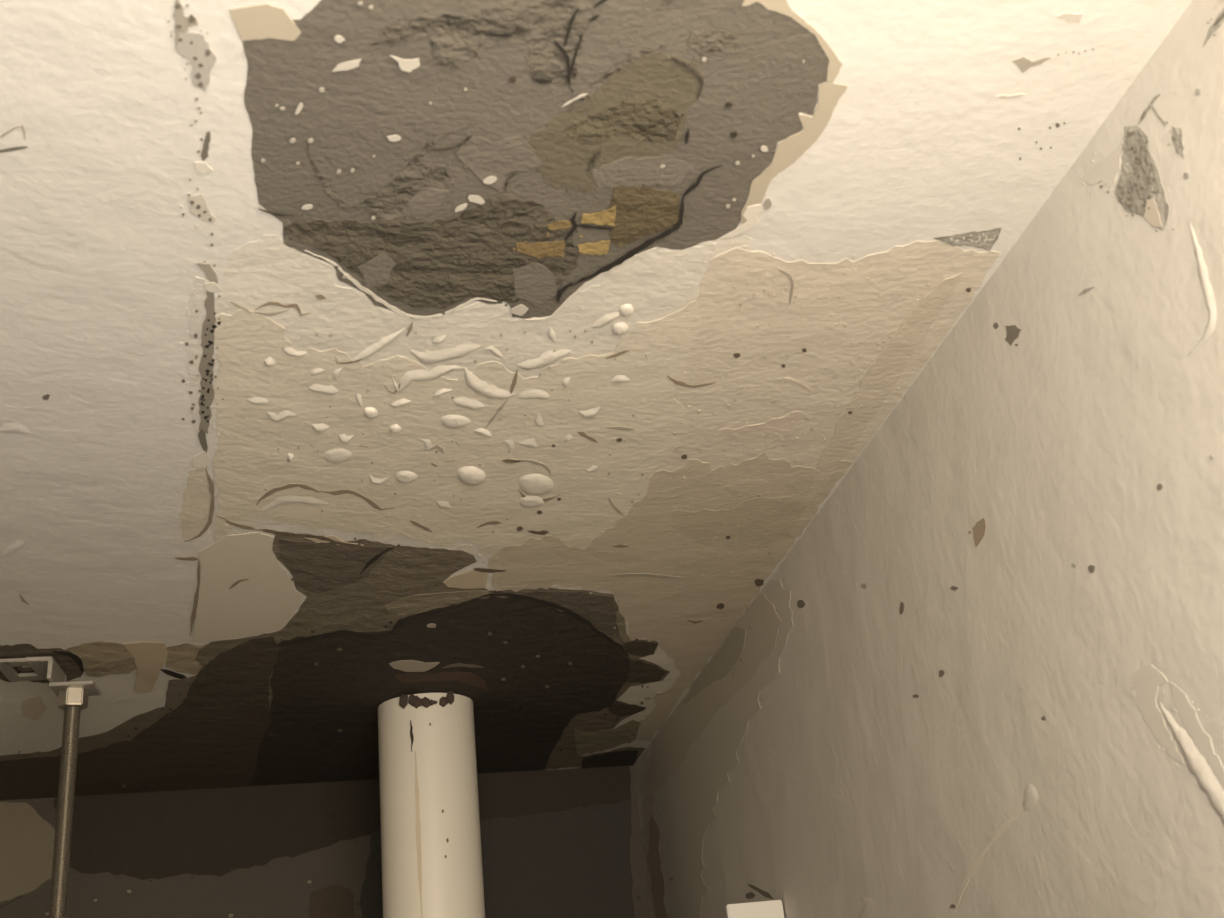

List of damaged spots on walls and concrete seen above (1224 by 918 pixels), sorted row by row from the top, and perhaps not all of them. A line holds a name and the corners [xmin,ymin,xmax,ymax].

flaking render [229,0,848,321]
crack [486,0,607,93]
water stain [526,44,704,193]
flaking render [1107,126,1174,232]
water stain [69,162,1001,918]
water stain [0,751,61,812]